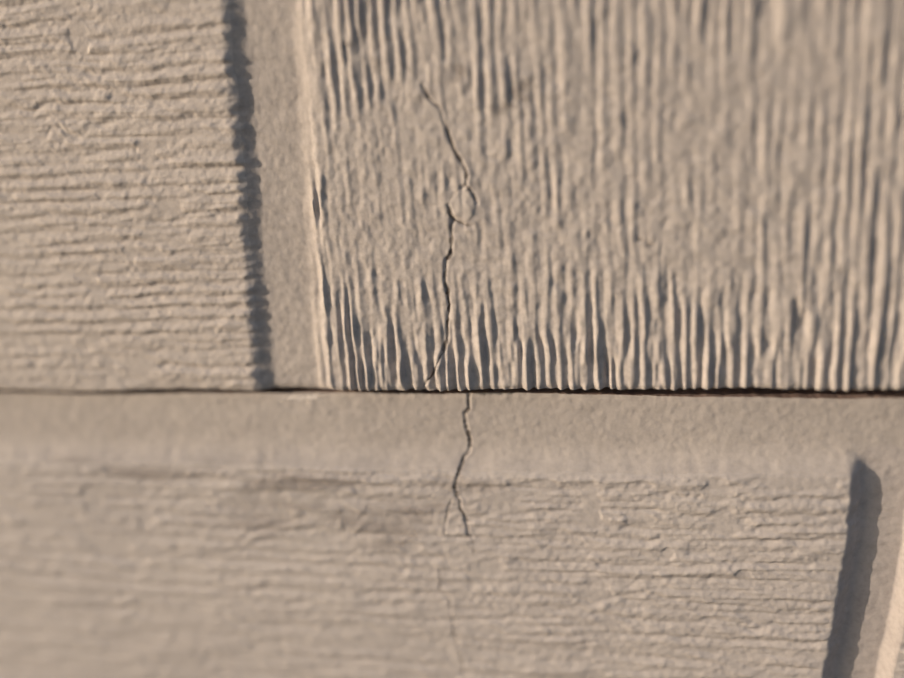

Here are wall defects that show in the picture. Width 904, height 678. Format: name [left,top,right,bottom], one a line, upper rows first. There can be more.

crack [425,92,476,262]
crack [428,285,450,379]
crack [444,401,474,551]